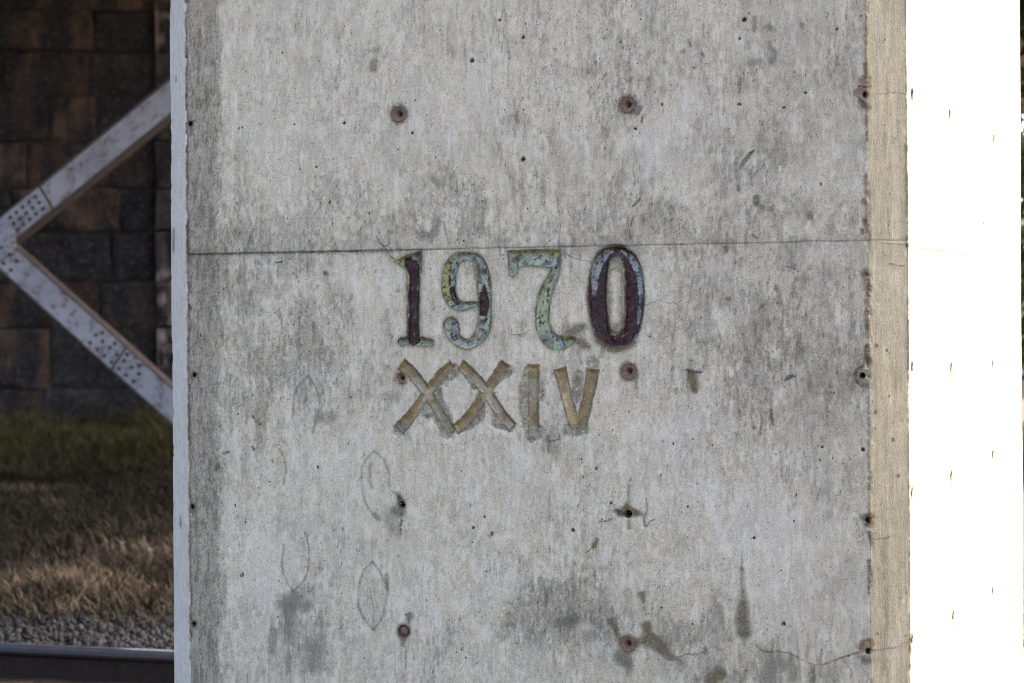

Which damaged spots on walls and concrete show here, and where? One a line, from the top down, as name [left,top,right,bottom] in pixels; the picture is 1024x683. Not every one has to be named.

water stain [737,573,750,642]
rust [609,619,682,670]